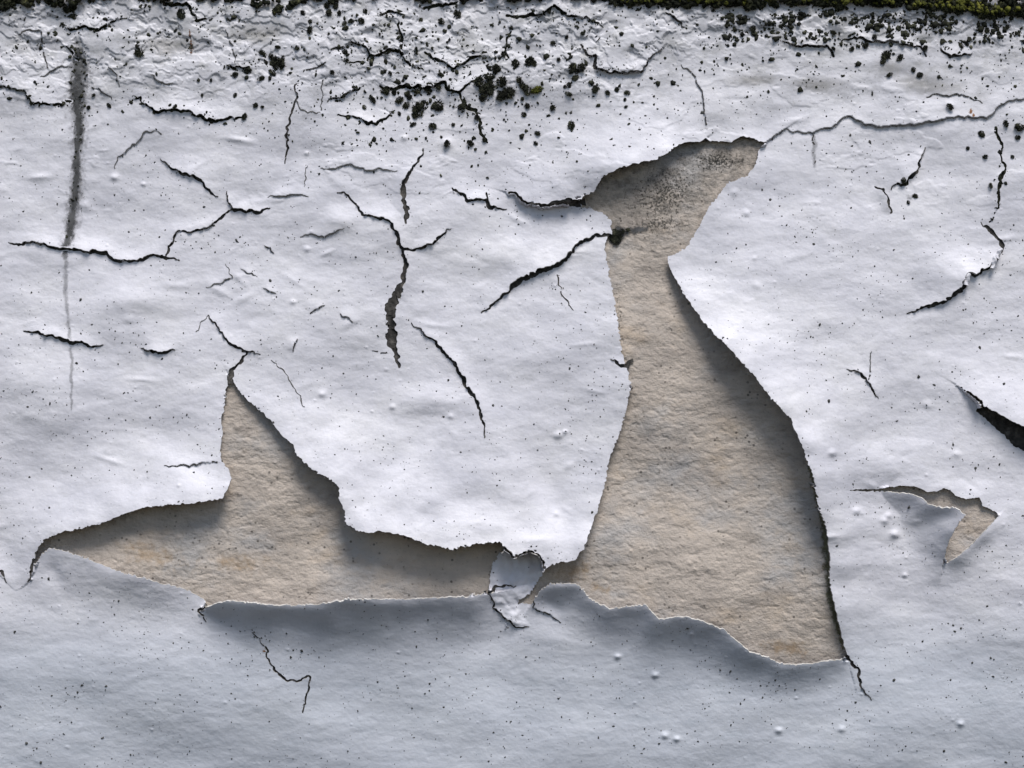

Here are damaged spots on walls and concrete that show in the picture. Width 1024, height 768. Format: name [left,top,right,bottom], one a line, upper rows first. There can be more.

damp [63,48,88,253]
crack [4,2,707,438]
crack [771,93,1023,314]
peeling [0,105,1008,690]
crack [847,351,879,399]
peeling [954,369,1024,451]
crack [252,632,311,712]